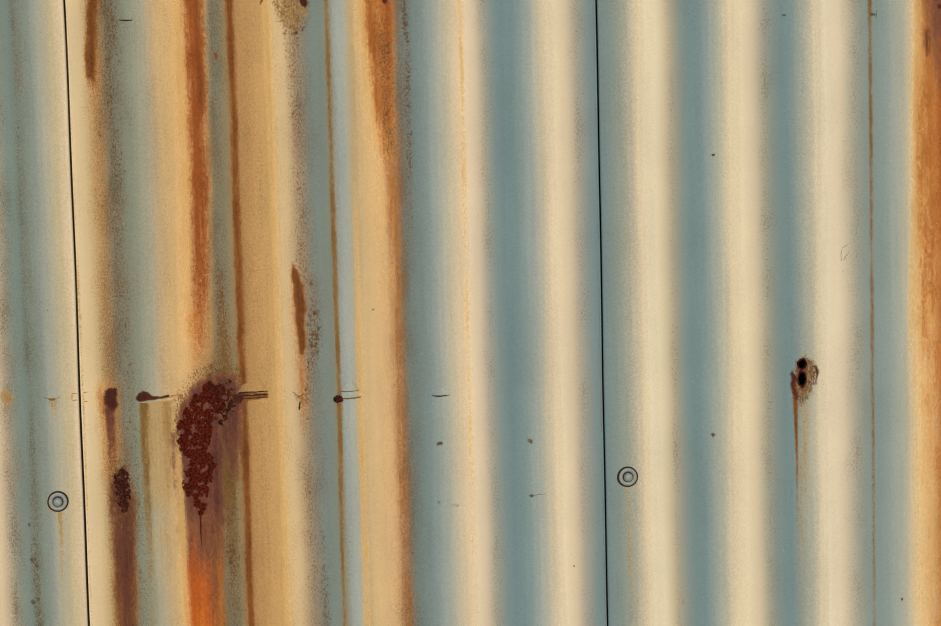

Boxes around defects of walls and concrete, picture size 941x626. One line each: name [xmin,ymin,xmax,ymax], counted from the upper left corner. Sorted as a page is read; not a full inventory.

rust [84,0,98,86]
rust [98,388,139,626]
rust [171,0,255,626]
rust [292,264,322,406]
rust [325,0,346,626]
rust [357,0,414,363]
rust [909,0,941,392]